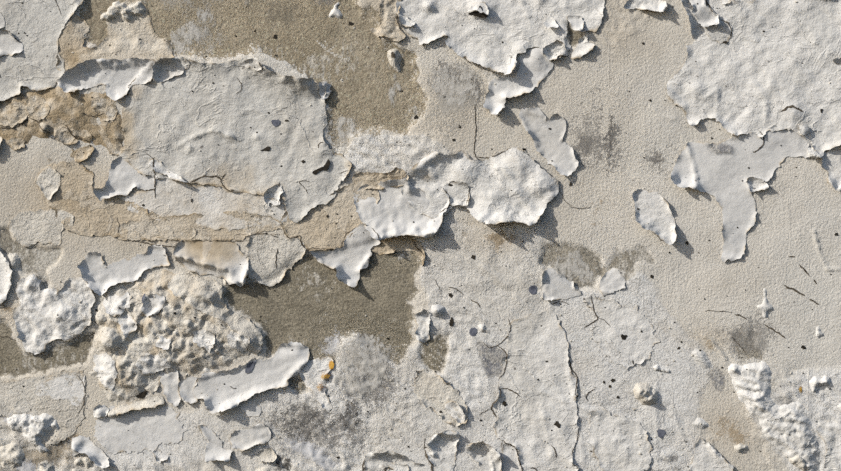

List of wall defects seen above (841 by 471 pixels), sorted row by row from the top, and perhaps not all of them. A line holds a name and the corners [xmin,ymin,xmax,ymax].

peeling [666,0,841,263]
peeling [0,0,605,471]
peeling [632,189,689,245]
crack [479,319,521,417]
crack [501,442,537,471]